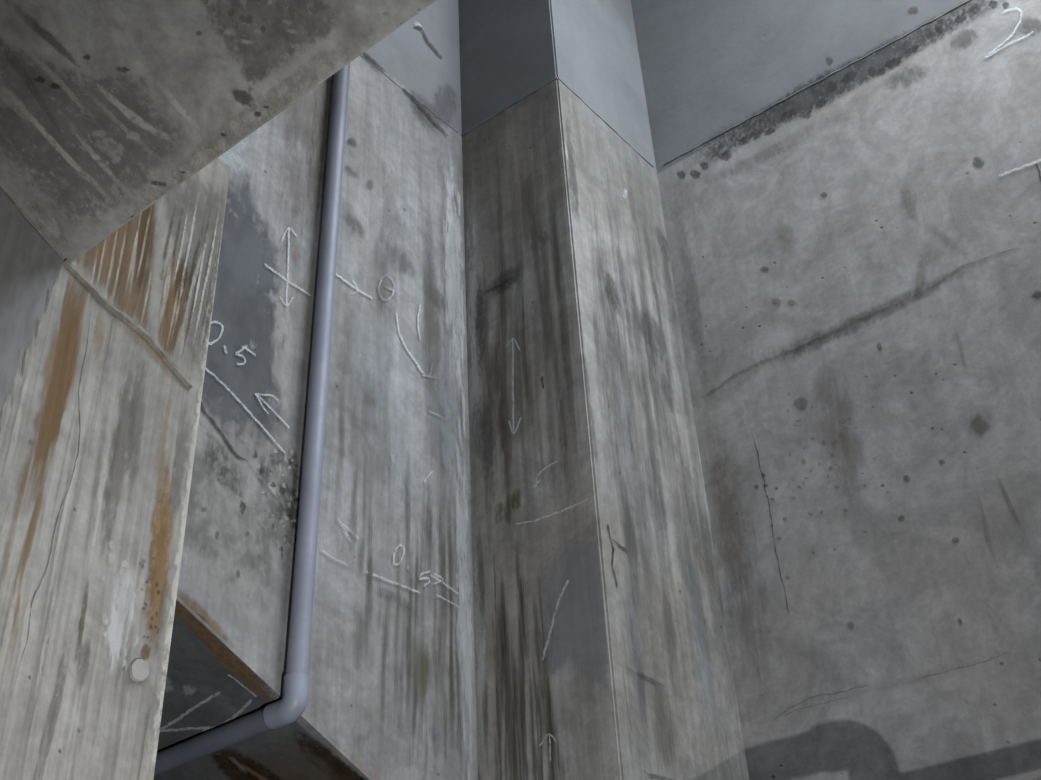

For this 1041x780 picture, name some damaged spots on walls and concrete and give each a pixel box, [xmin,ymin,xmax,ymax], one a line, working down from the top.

mould [709,0,993,156]
rust [77,205,155,323]
rust [160,255,188,352]
rust [15,281,86,623]
crack [15,314,91,682]
rust [141,468,271,696]
crack [201,401,248,462]
leakage [444,174,487,780]
crack [607,523,629,588]
crack [752,435,789,614]